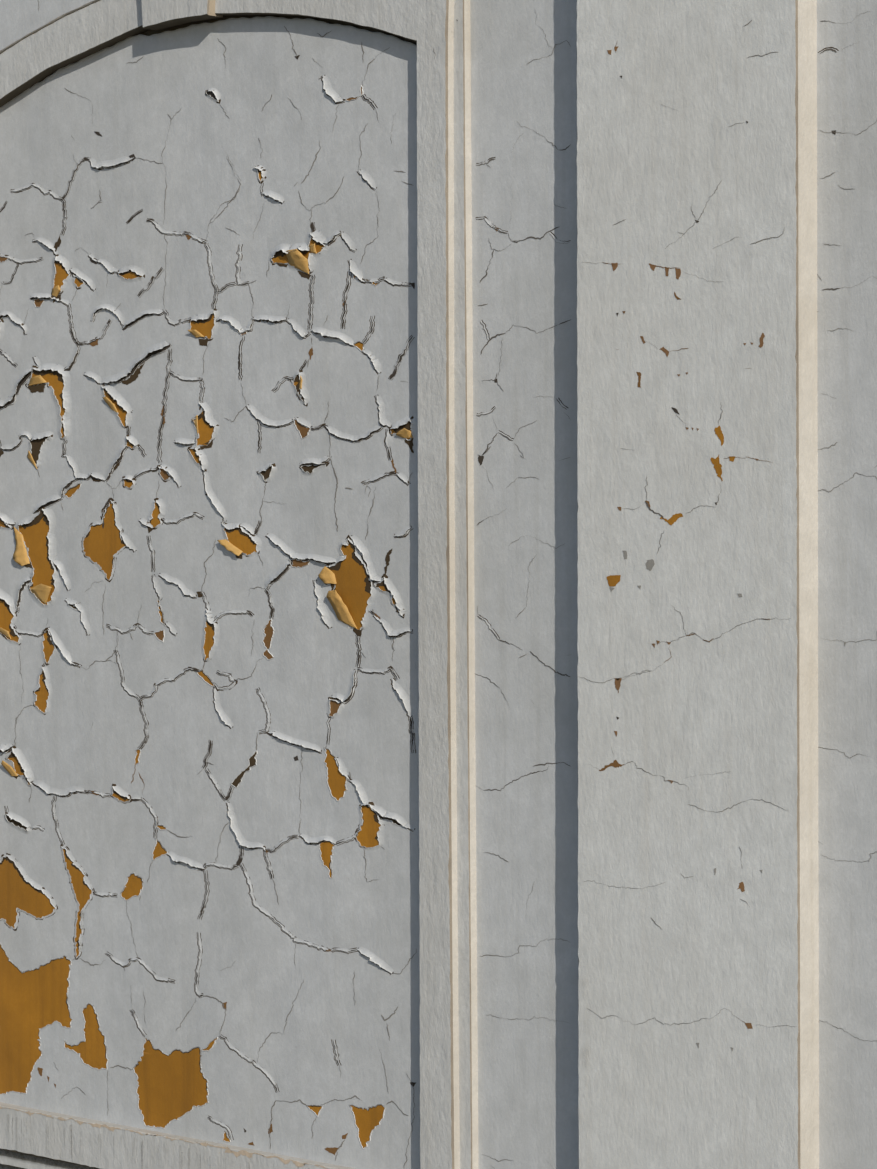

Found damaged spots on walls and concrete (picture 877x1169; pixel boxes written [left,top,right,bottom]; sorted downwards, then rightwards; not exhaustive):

crack [284,26,412,264]
peeling [0,476,82,715]
peeling [0,199,146,477]
crack [61,439,127,482]
crack [64,598,200,787]
peeling [81,385,204,643]
crack [0,109,383,463]
peeling [197,456,406,729]
peeling [298,669,415,882]
crack [312,580,416,753]
peeling [0,743,416,1169]
crack [80,688,417,1148]